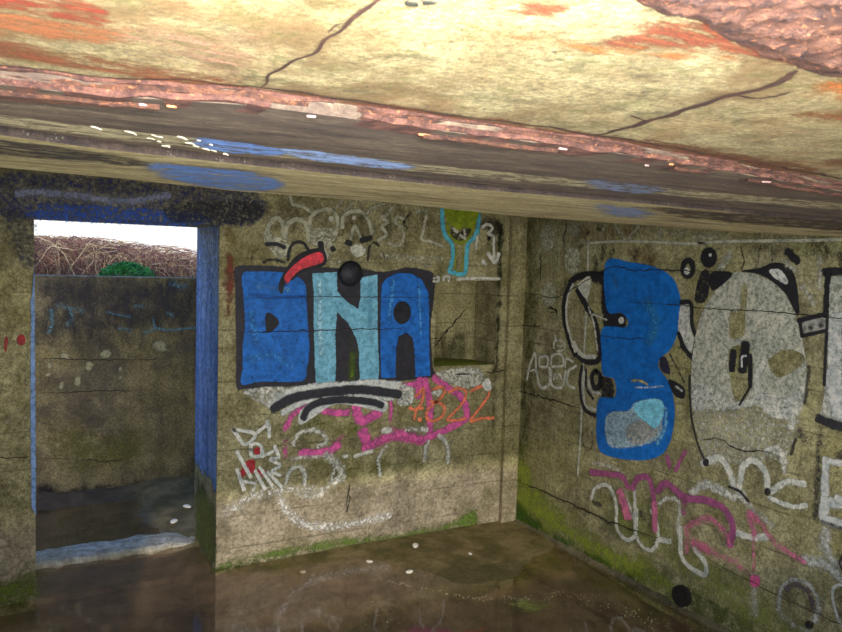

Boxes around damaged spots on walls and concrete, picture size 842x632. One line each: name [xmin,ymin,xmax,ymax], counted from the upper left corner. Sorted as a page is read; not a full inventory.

crack [0,0,841,179]
corrosion [0,0,842,198]